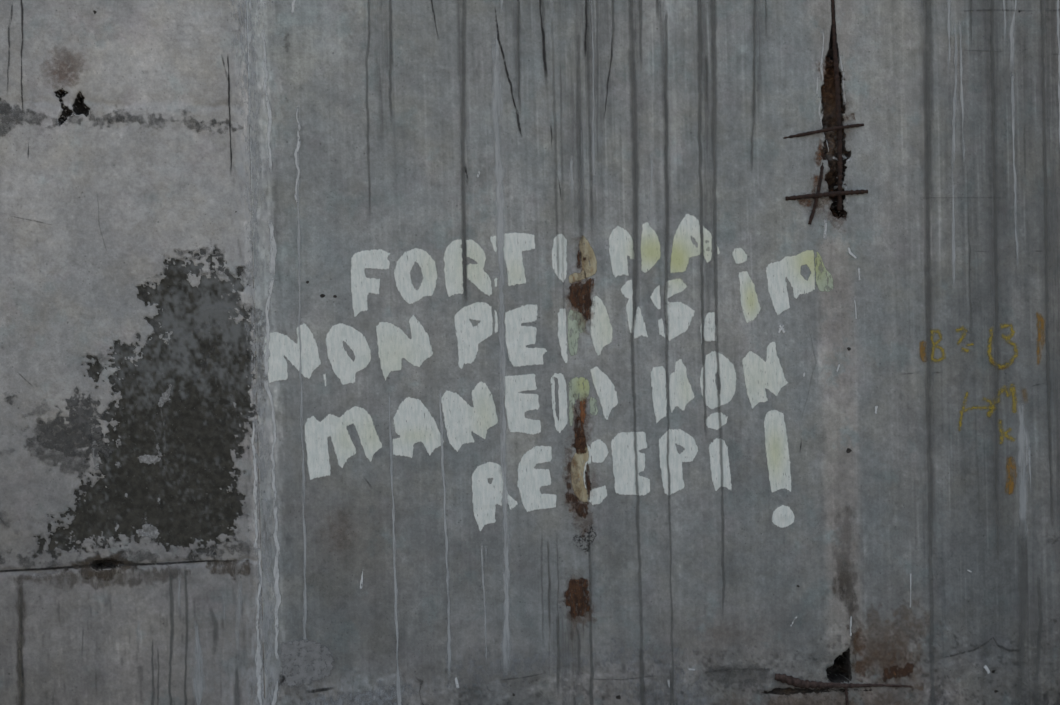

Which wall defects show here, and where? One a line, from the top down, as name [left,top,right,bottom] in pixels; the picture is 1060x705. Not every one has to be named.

spalling [55,88,90,125]
crack [495,10,521,133]
crack [539,0,547,73]
rust [783,0,868,225]
spalling [816,32,850,161]
rust [568,235,594,320]
damp [629,0,641,580]
damp [698,0,725,606]
damp [188,222,281,705]
rust [565,396,591,518]
crack [0,560,218,572]
spalling [826,648,852,683]